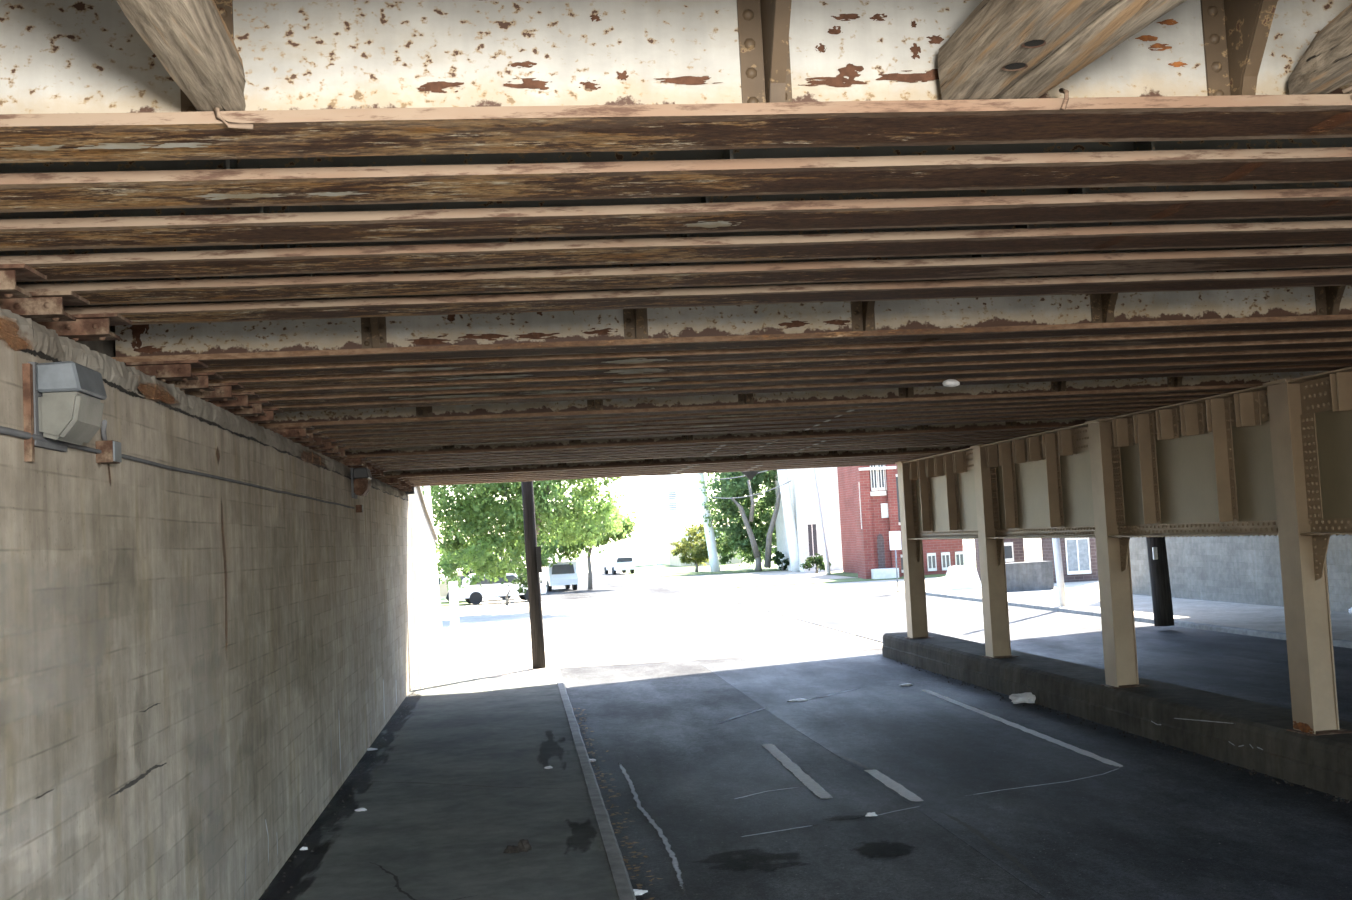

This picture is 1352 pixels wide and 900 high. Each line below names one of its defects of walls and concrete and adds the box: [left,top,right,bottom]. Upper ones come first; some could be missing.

peeling [815,13,887,53]
peeling [798,21,944,87]
peeling [418,81,464,93]
peeling [503,61,549,90]
peeling [654,76,722,85]